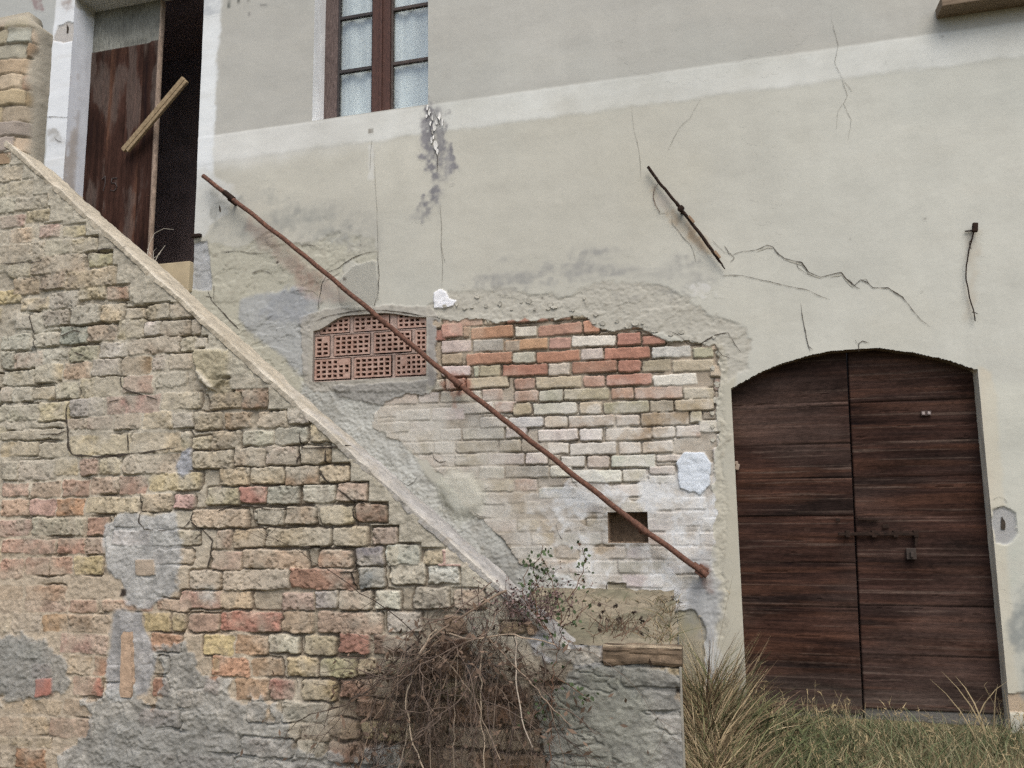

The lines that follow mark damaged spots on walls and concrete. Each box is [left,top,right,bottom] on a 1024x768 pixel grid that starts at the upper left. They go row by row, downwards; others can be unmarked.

leakage [406,94,462,230]
corrosion [243,214,354,306]
corrosion [662,205,716,258]
crack [725,245,929,350]
corrosion [959,227,985,325]
corrosion [437,370,477,411]
spalling [373,289,722,694]
spalling [992,506,1018,539]